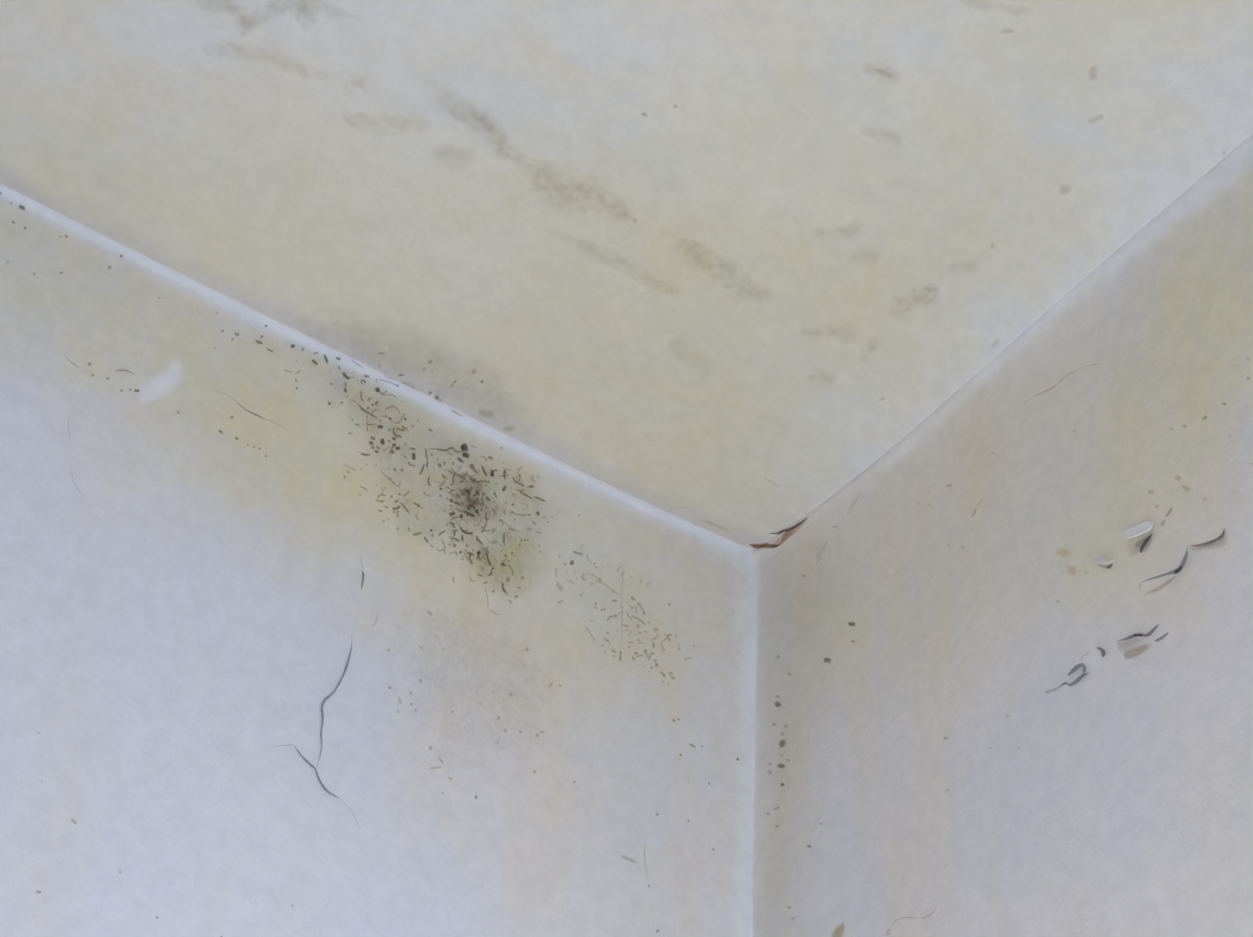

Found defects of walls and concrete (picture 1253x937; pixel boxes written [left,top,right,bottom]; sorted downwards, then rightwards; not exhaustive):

damp [312,355,545,566]
peeling [1123,520,1154,552]